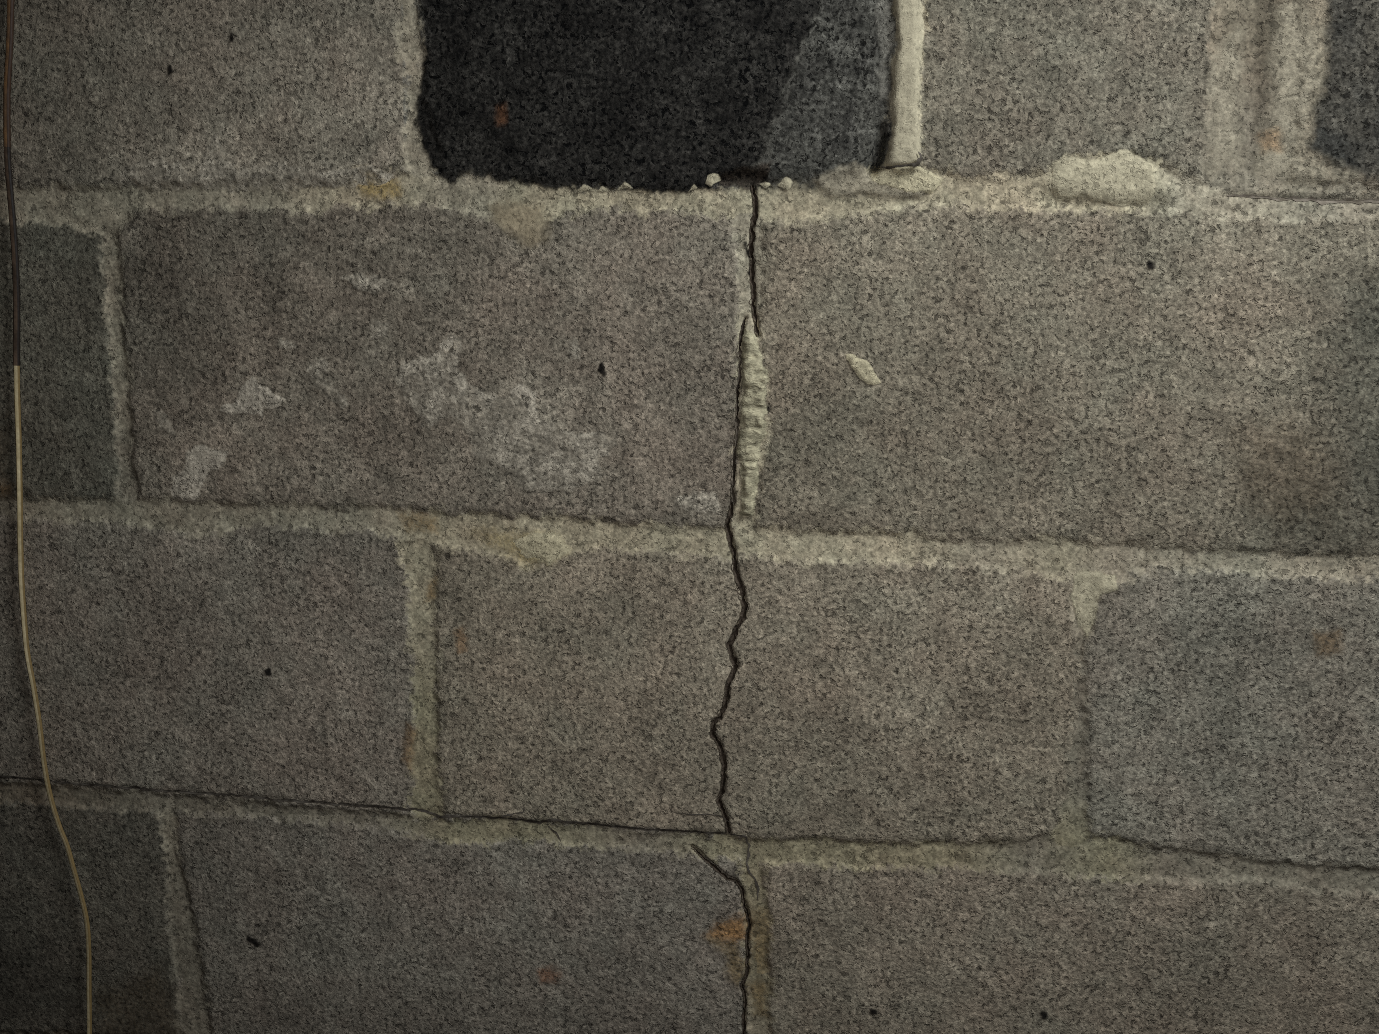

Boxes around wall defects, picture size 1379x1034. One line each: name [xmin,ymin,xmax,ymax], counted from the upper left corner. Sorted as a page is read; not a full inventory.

leakage [414,0,894,193]
crack [0,185,760,1034]